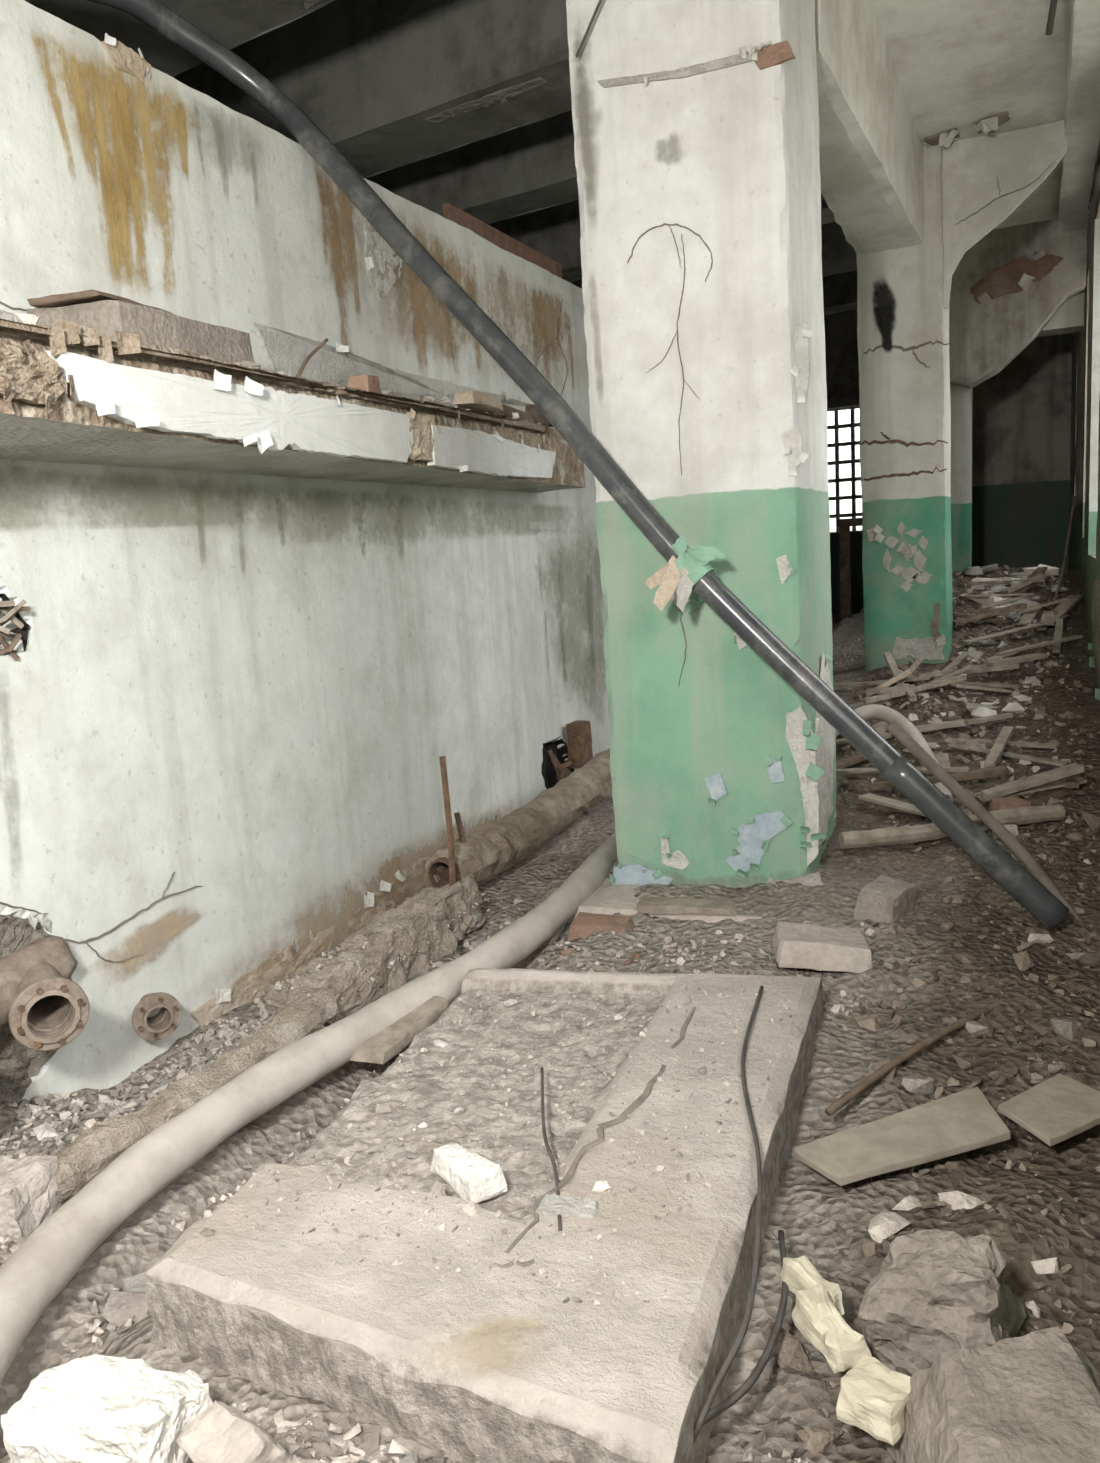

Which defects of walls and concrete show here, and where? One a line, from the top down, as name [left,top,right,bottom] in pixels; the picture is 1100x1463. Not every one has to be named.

rust [35,39,193,290]
peeling [0,309,556,478]
rust [317,173,360,346]
rust [405,271,464,364]
rust [525,288,574,389]
crack [863,340,950,368]
spalling [970,247,1064,308]
crack [861,432,948,481]
peeling [669,587,703,617]
peeling [866,522,932,592]
peeling [820,651,834,691]
peeling [726,706,836,888]